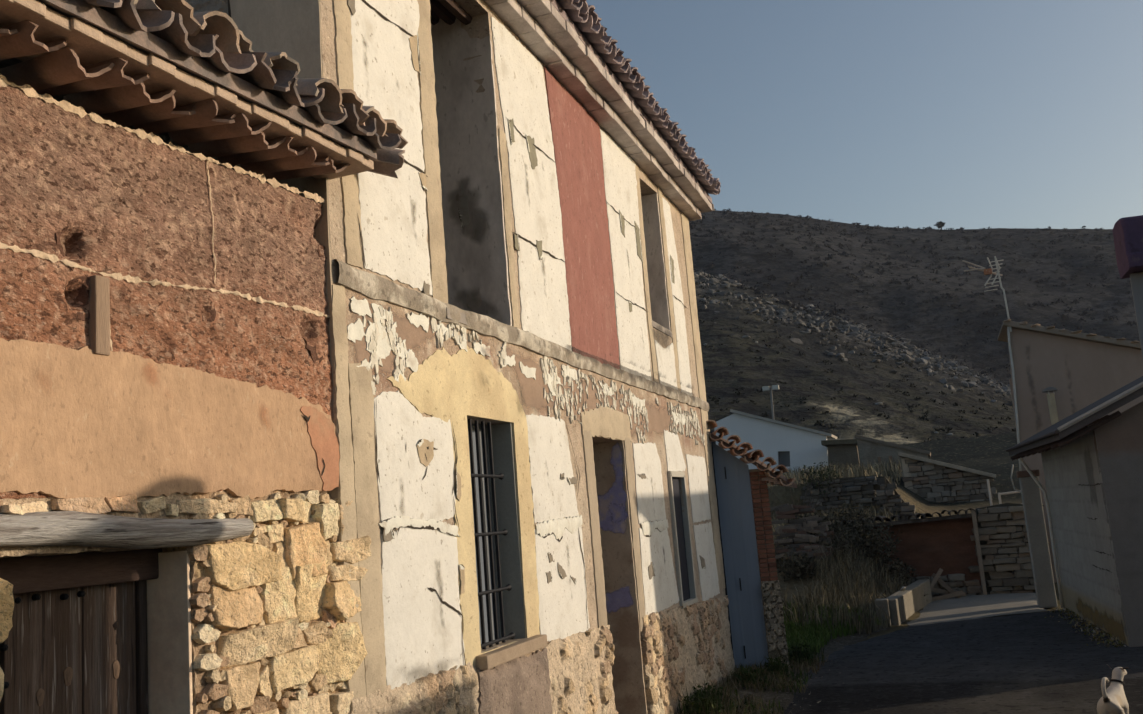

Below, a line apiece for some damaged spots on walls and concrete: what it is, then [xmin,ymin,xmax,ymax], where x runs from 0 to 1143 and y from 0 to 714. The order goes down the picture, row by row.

spalling [300,318,330,365]
peeling [347,296,705,446]
peeling [300,406,340,491]
spalling [416,439,434,467]
peeling [598,443,628,533]
peeling [378,516,459,542]
peeling [641,519,669,537]
peeling [605,587,633,613]
crack [427,587,466,665]